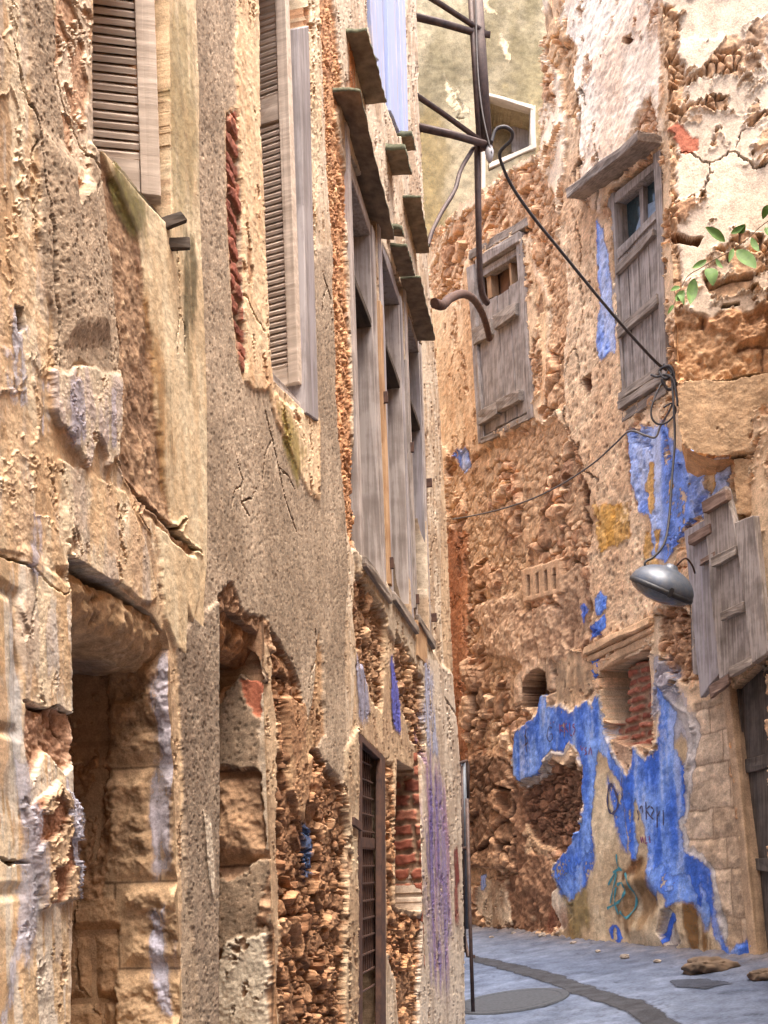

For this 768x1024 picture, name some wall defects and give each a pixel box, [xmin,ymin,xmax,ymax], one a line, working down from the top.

spalling [50,0,201,560]
spalling [225,105,249,383]
crack [231,409,297,532]
spalling [319,0,427,769]
spalling [541,2,582,124]
spalling [428,154,751,955]
spalling [670,227,768,383]
peeling [674,33,768,116]
crack [680,123,768,197]
spalling [22,695,85,910]
spalling [217,572,352,1024]
spalling [385,755,424,1024]